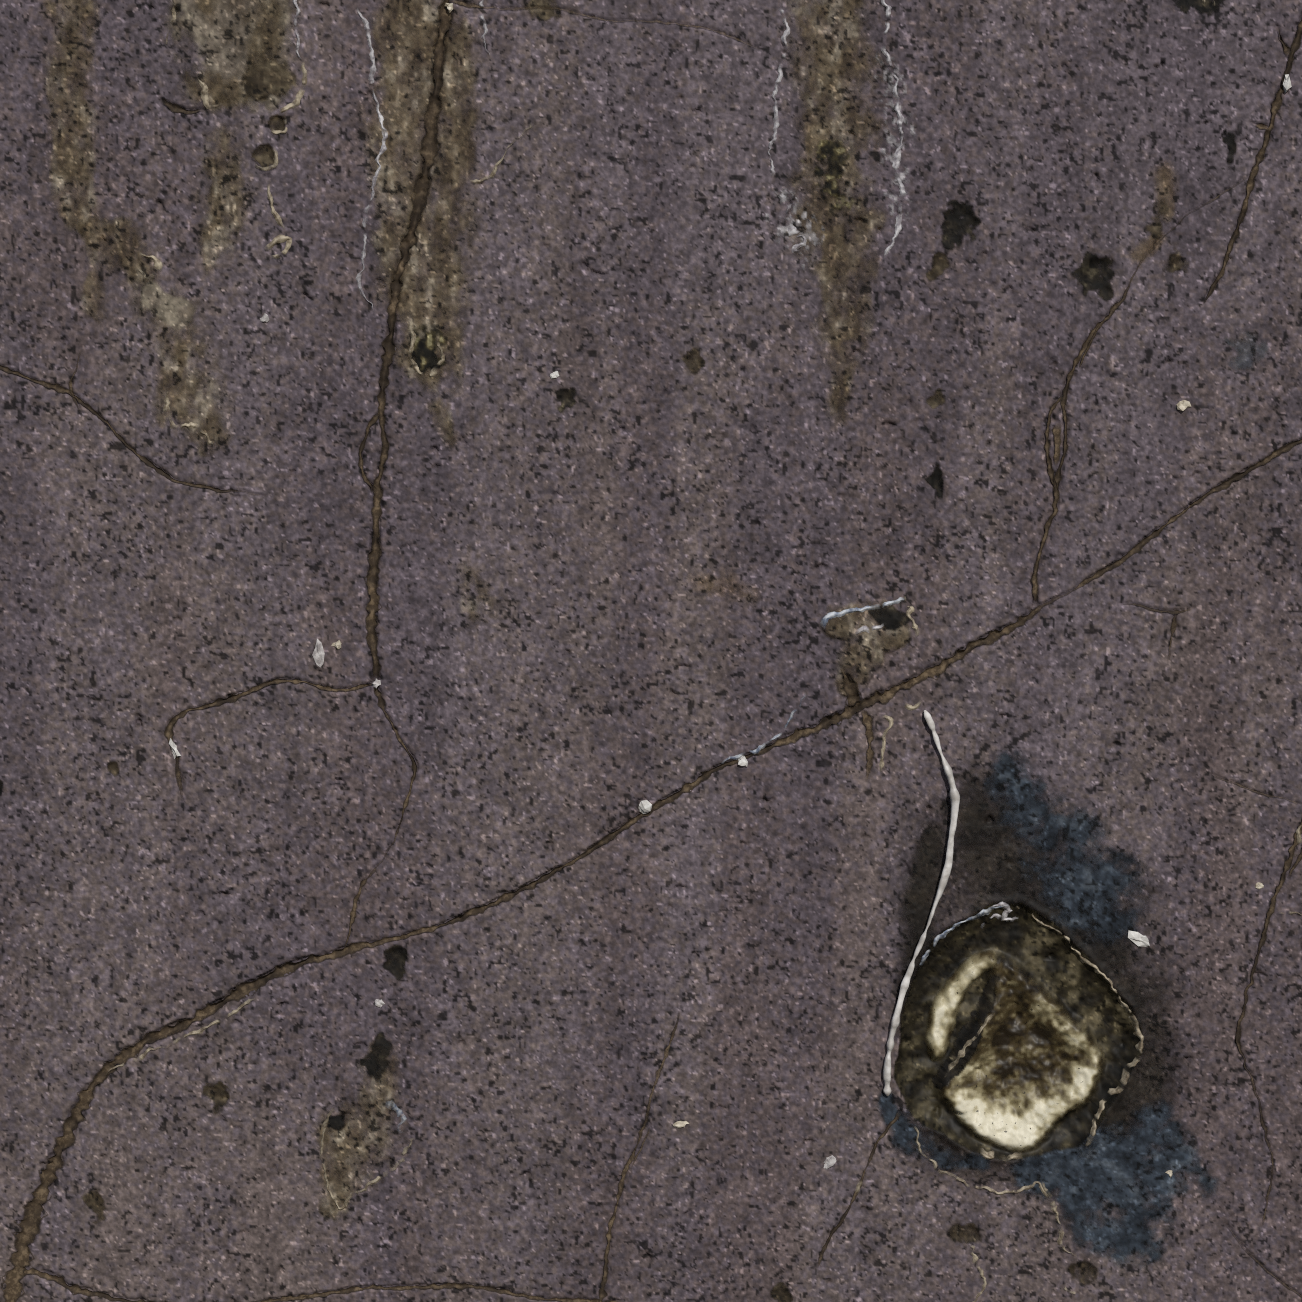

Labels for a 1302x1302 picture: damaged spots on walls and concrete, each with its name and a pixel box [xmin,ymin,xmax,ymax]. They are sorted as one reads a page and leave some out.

damp [202,135,243,263]
crack [586,15,733,38]
damp [766,0,908,418]
crack [1205,20,1302,300]
crack [164,0,498,848]
crack [0,266,1302,1302]
peeling [822,597,918,694]
damp [923,1126,1024,1173]
damp [971,1253,987,1302]
spalling [894,902,1144,1195]
damp [898,778,1169,1156]
spalling [1128,930,1150,947]